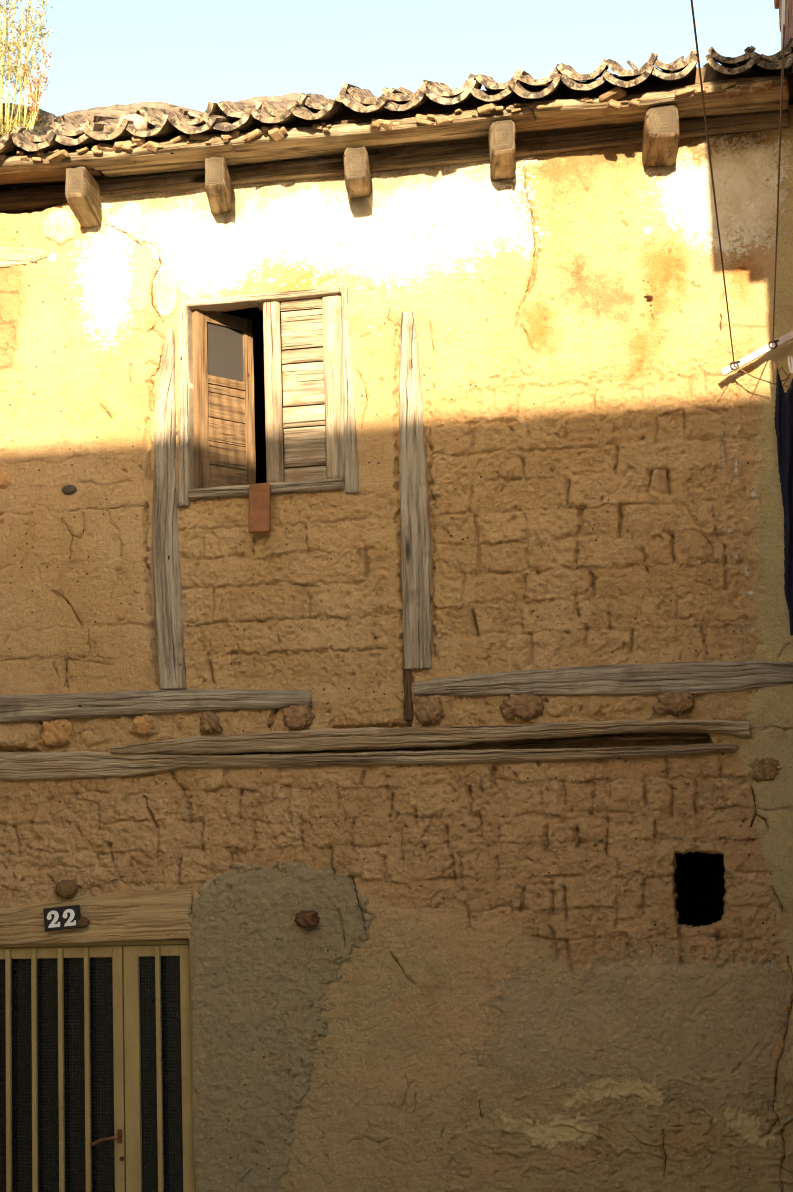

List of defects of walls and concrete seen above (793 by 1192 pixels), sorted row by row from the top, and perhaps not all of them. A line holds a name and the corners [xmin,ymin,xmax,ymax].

flaking render [49,156,563,359]
crack [515,176,536,349]
crack [61,505,147,559]
crack [1,594,113,687]
crack [766,957,793,1192]